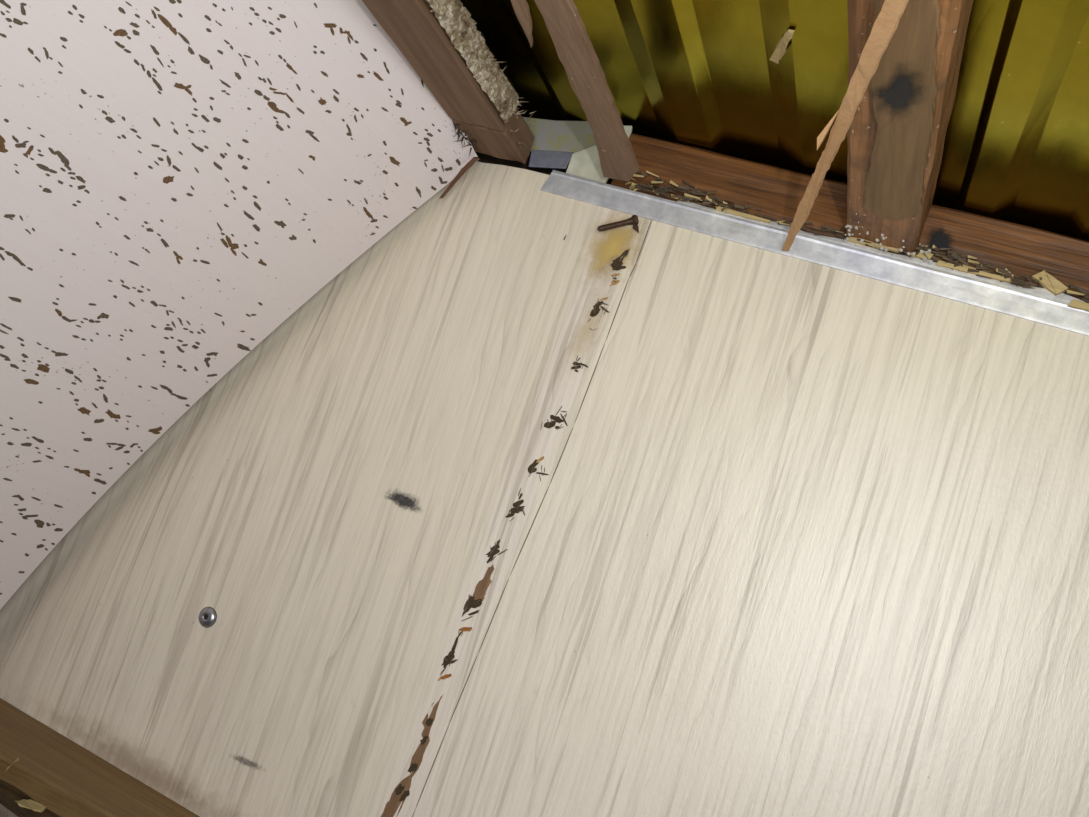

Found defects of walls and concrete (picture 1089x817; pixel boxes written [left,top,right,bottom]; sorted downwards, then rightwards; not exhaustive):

crack [412,220,652,817]
damp [595,228,633,273]